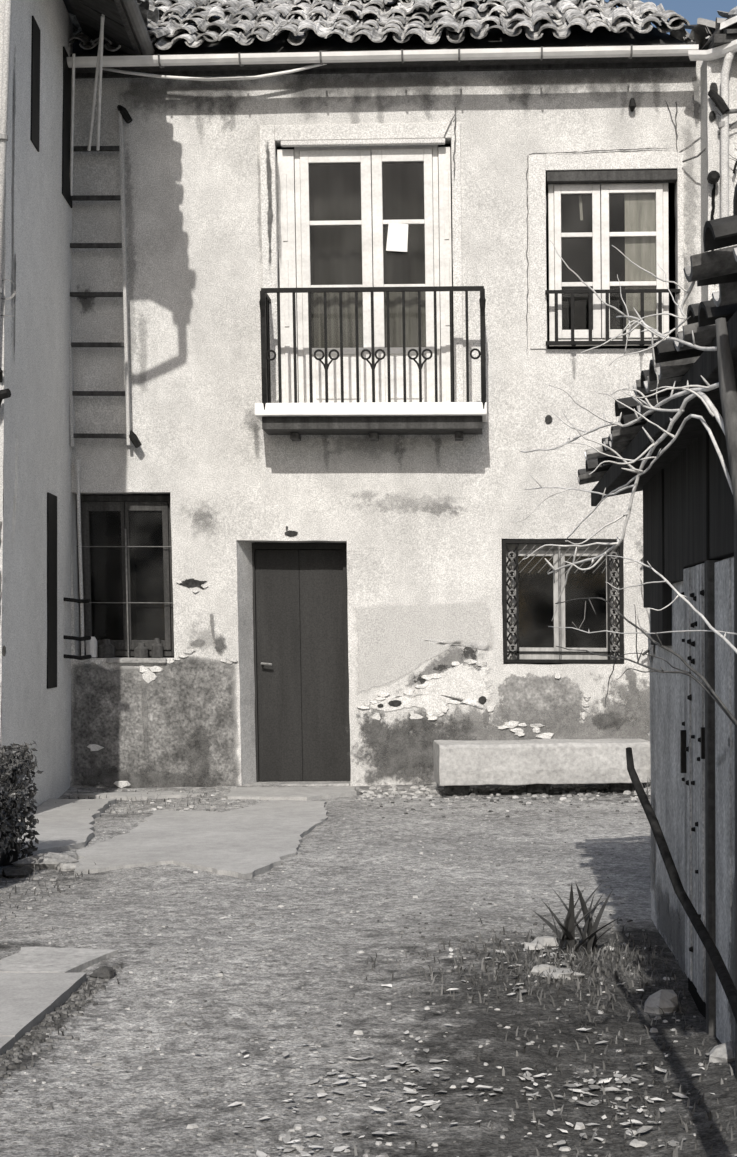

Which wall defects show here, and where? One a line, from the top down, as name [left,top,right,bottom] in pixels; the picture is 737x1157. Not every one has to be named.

leakage [287,72,446,104]
leakage [500,68,665,96]
leakage [692,76,701,123]
leakage [407,646,481,686]
flaking render [357,659,591,739]
leakage [81,680,217,788]
leakage [353,669,650,785]